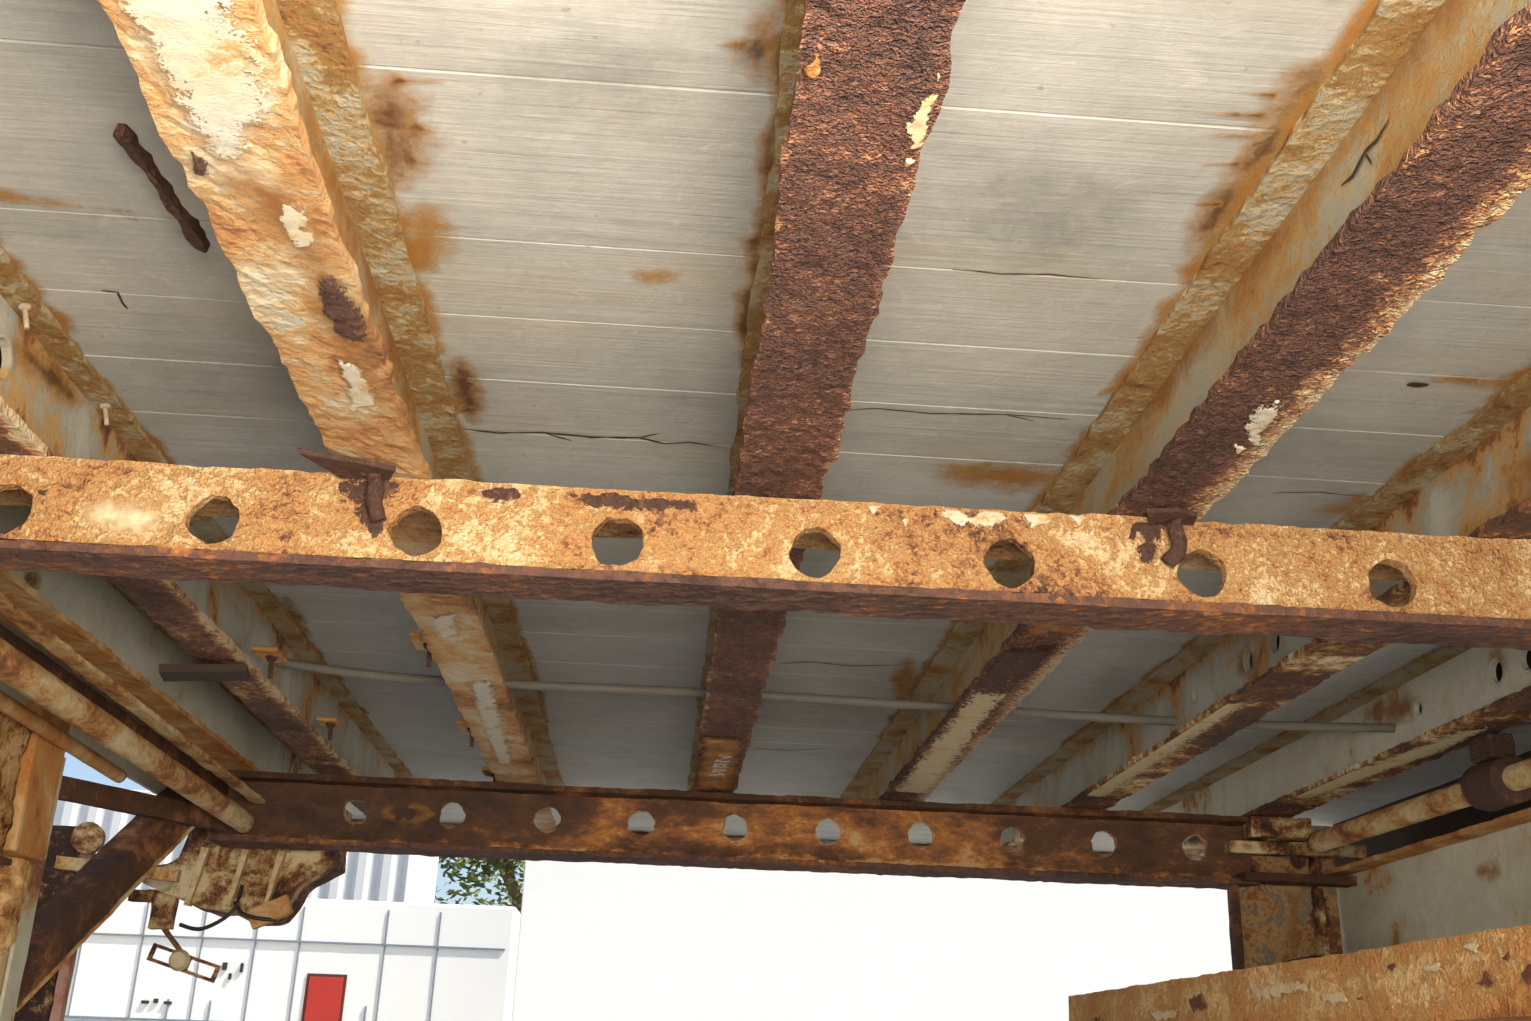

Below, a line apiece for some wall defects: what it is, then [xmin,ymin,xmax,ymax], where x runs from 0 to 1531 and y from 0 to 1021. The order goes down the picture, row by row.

peeling [117,0,281,162]
corrosion [226,177,330,288]
peeling [280,202,320,248]
corrosion [1100,0,1379,418]
corrosion [348,46,482,482]
crack [952,269,1096,279]
peeling [338,360,377,412]
crack [464,429,721,447]
crack [851,408,1062,421]
peeling [1234,400,1282,454]
corrosion [337,478,400,539]
corrosion [1129,522,1166,564]